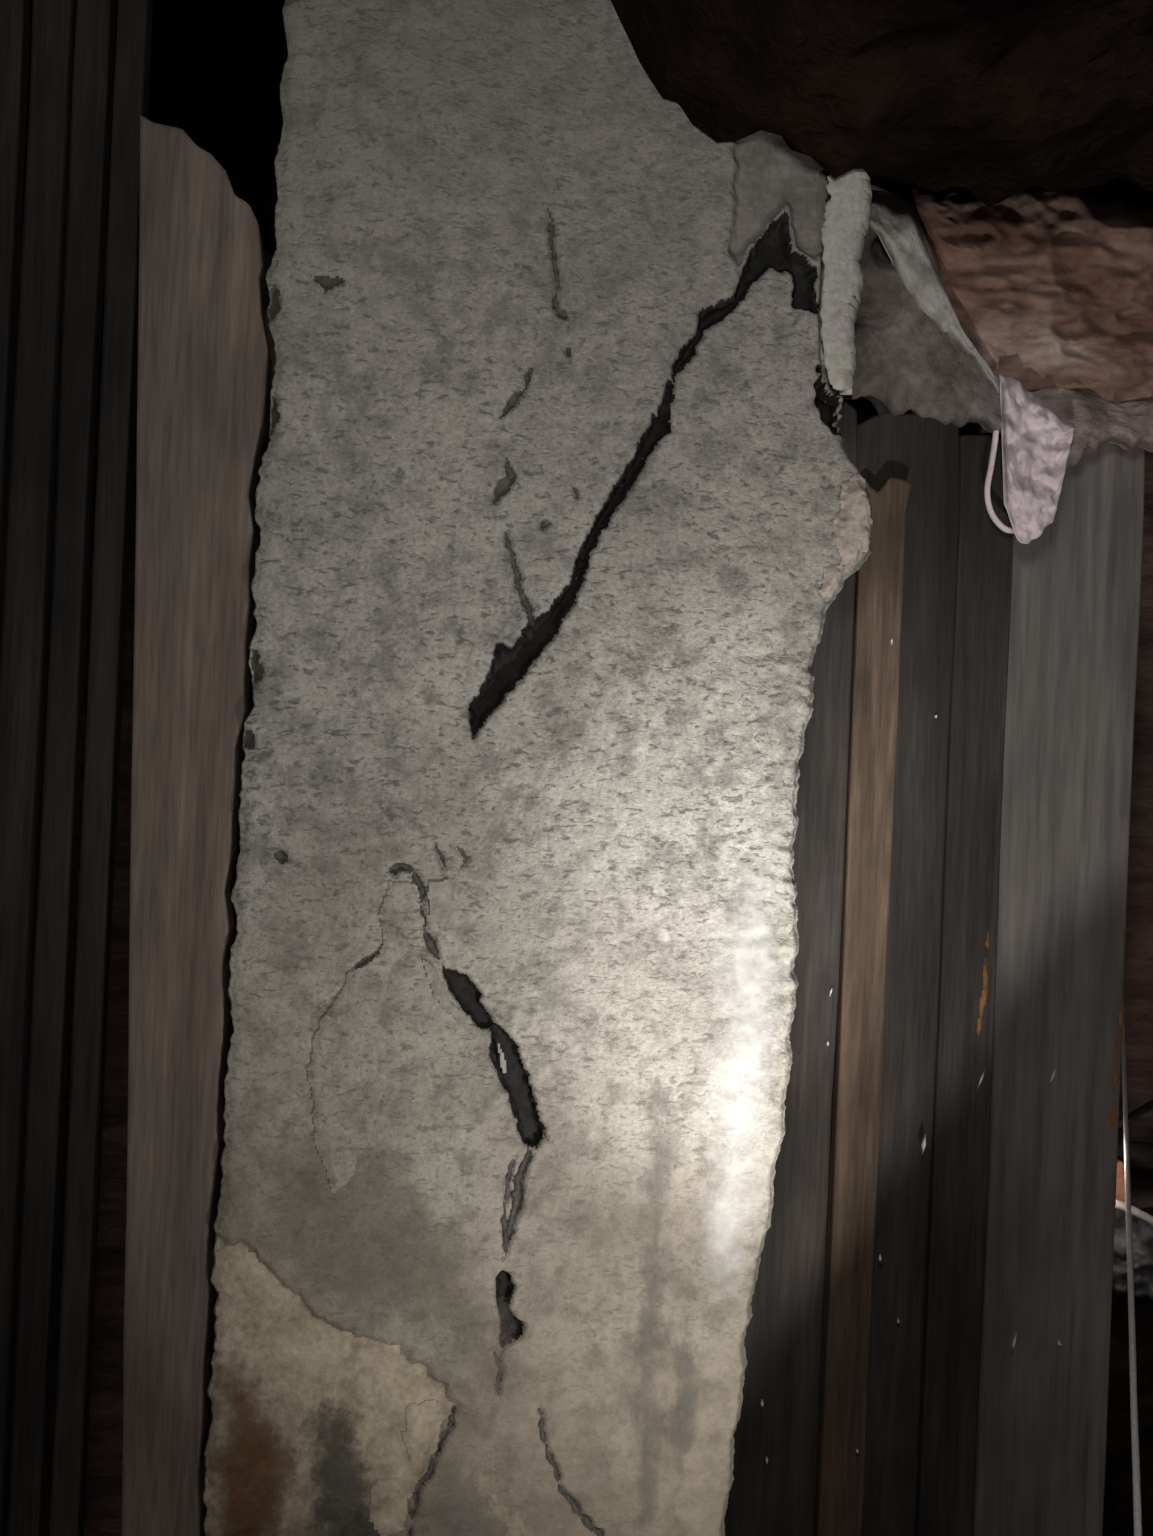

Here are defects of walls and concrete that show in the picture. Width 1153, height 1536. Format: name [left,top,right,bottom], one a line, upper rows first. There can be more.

crack [468,208,820,739]
crack [814,365,842,437]
peeling [984,374,1075,544]
crack [355,949,382,968]
crack [388,844,549,1395]
peeling [204,1238,455,1536]
crack [408,1408,455,1536]
peeling [474,1471,543,1536]
crack [539,1409,603,1536]